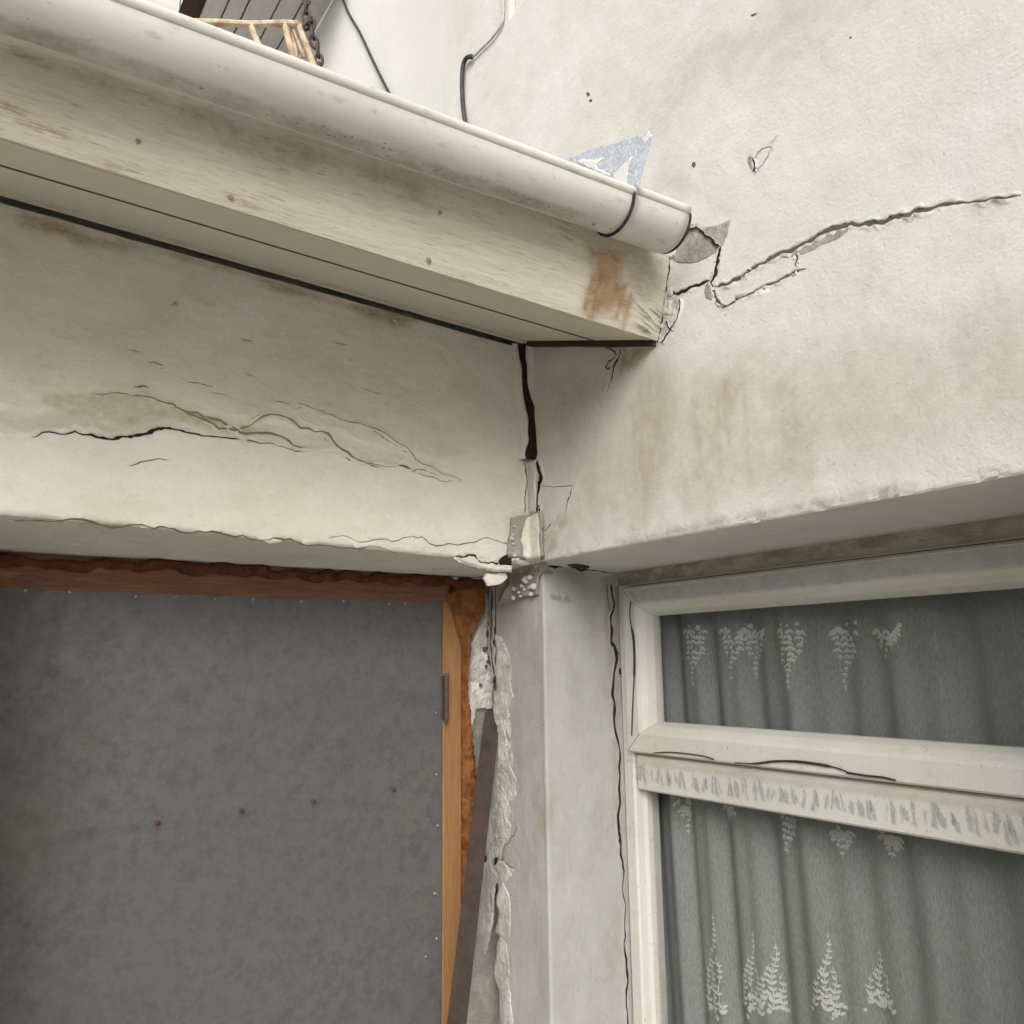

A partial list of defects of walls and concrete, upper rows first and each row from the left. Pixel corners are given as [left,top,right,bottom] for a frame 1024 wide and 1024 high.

peeling [564,131,653,187]
corrosion [584,250,627,318]
spalling [669,220,731,264]
crack [656,191,1022,344]
crack [512,343,577,535]
crack [603,347,624,393]
spalling [453,459,551,1024]
crack [542,564,631,1024]